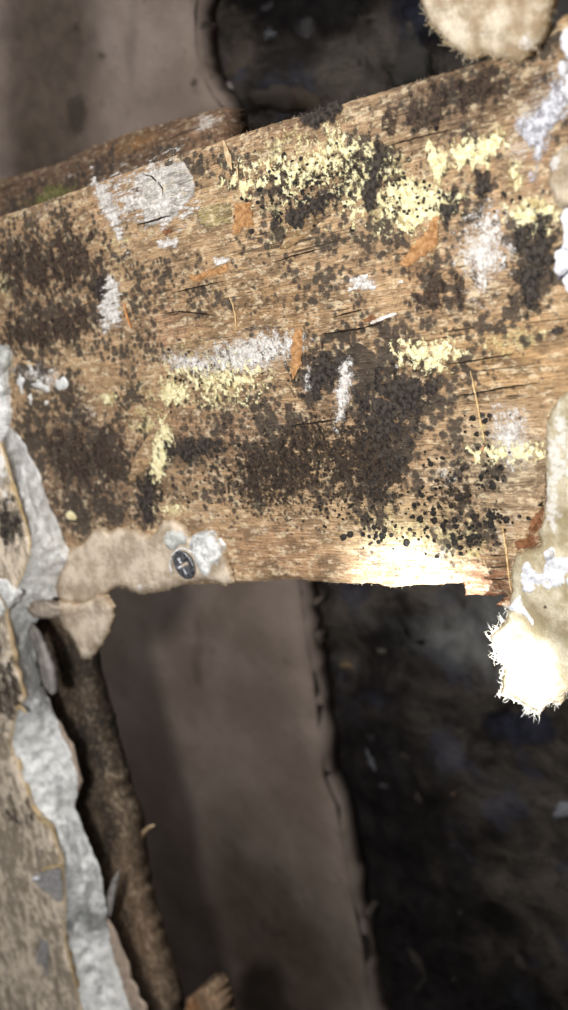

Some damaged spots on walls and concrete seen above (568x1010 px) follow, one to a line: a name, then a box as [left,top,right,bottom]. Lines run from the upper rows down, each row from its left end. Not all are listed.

leakage [28,183,77,204]
leakage [217,64,563,318]
leakage [0,223,114,357]
leakage [23,334,546,558]
leakage [0,498,21,546]